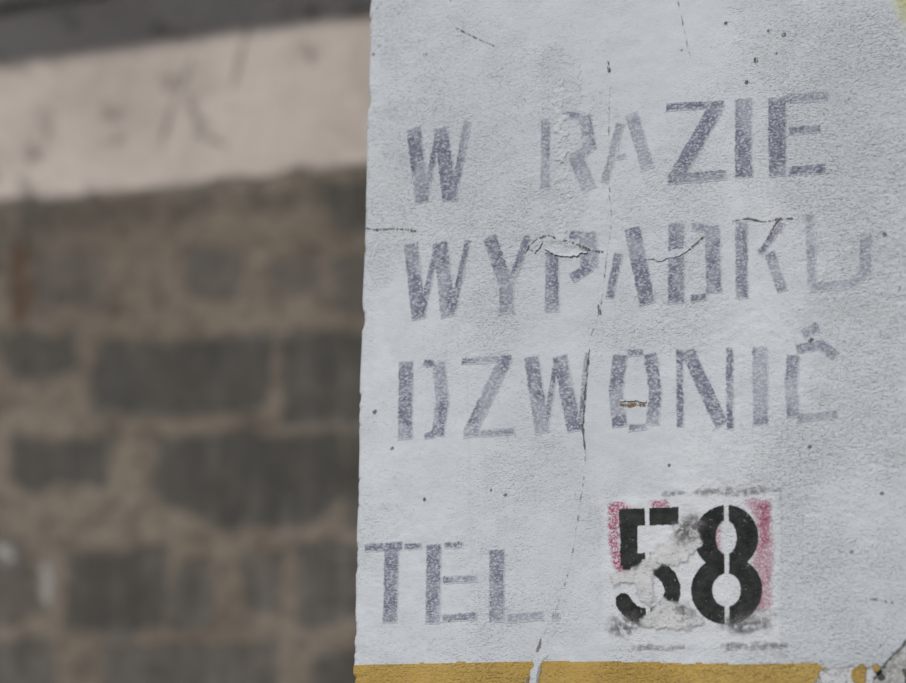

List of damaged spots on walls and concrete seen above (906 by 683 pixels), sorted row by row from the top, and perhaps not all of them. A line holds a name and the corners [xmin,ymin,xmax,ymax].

peeling [535,44,588,250]
peeling [814,639,906,683]